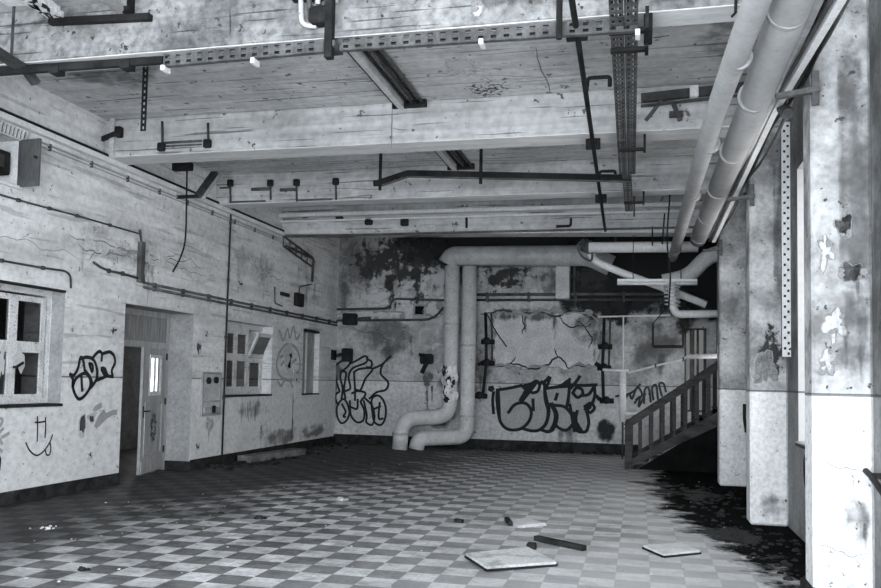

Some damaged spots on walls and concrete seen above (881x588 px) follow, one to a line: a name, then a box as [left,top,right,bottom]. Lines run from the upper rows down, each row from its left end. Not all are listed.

peeling [22,0,64,20]
leakage [339,237,448,310]
crack [481,309,598,370]
peeling [753,349,778,384]
peeling [818,305,848,376]